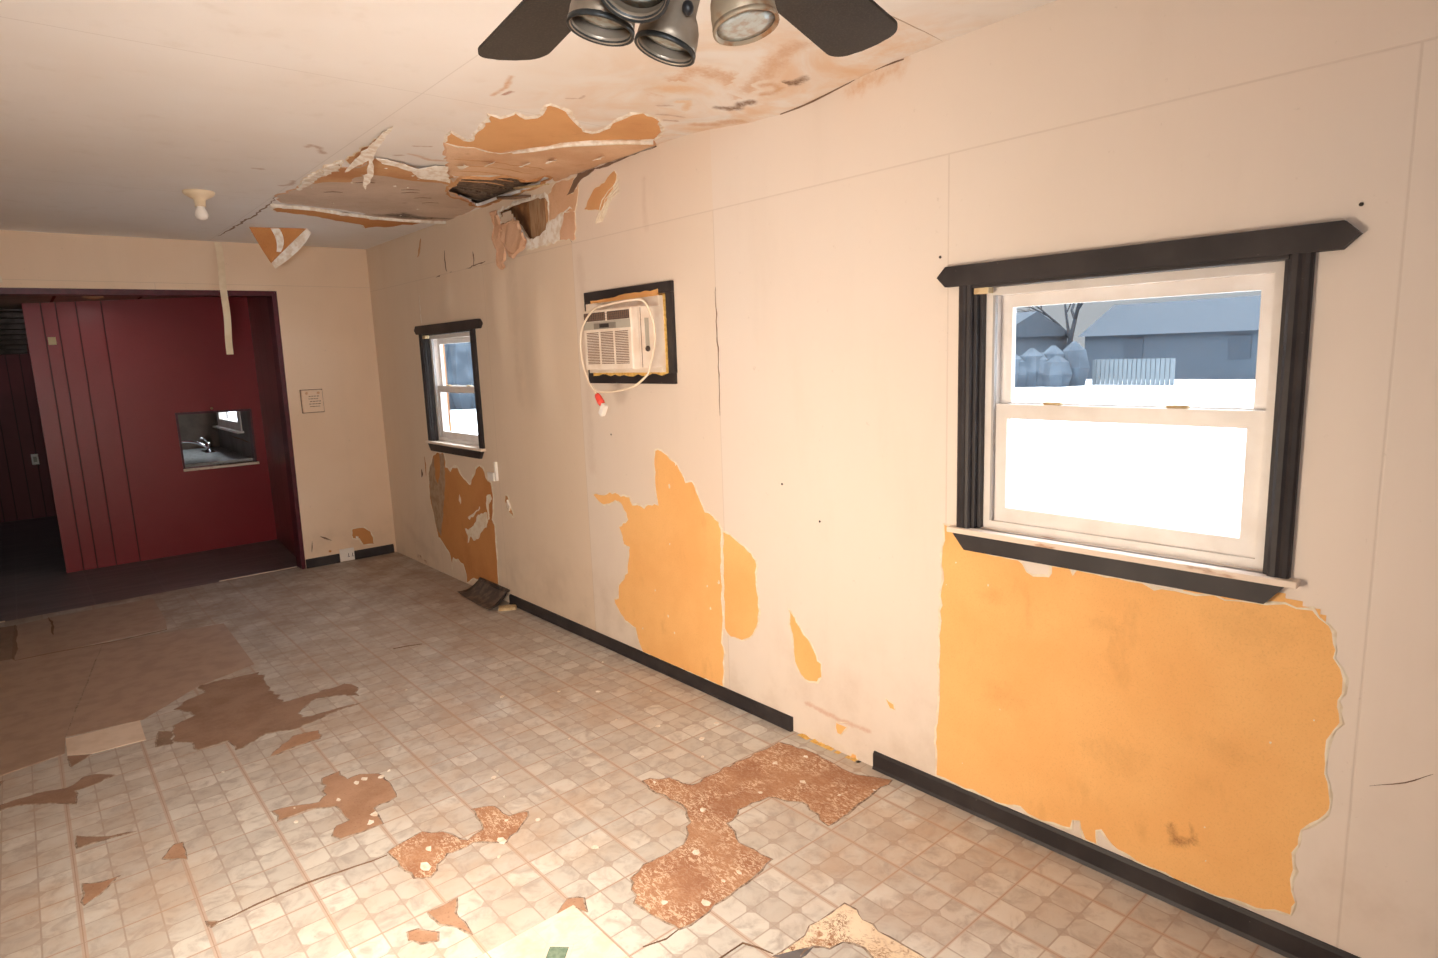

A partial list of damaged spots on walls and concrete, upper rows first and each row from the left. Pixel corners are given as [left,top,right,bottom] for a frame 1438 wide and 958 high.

peeling [442,103,665,217]
spalling [497,158,620,242]
peeling [428,452,514,585]
peeling [593,448,761,687]
peeling [788,608,822,684]
peeling [154,672,360,756]
peeling [934,523,1349,916]
peeling [271,771,397,840]
peeling [387,806,529,879]
peeling [629,742,892,930]
peeling [406,897,473,945]
peeling [772,902,926,958]